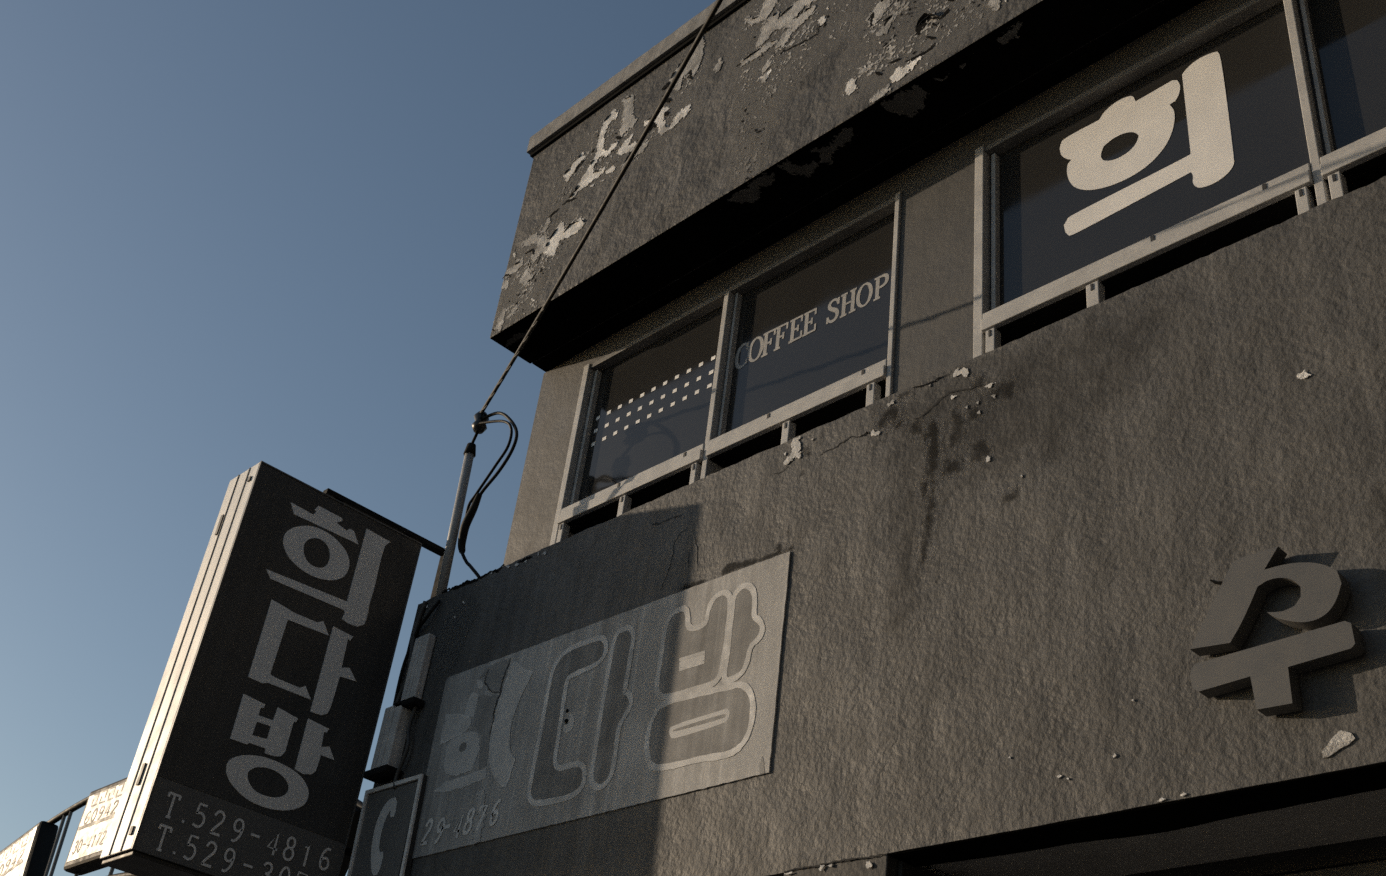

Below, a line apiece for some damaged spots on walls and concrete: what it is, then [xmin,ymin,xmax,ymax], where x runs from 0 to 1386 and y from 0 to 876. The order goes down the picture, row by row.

peeling [492,0,1007,331]
damp [878,407,977,557]